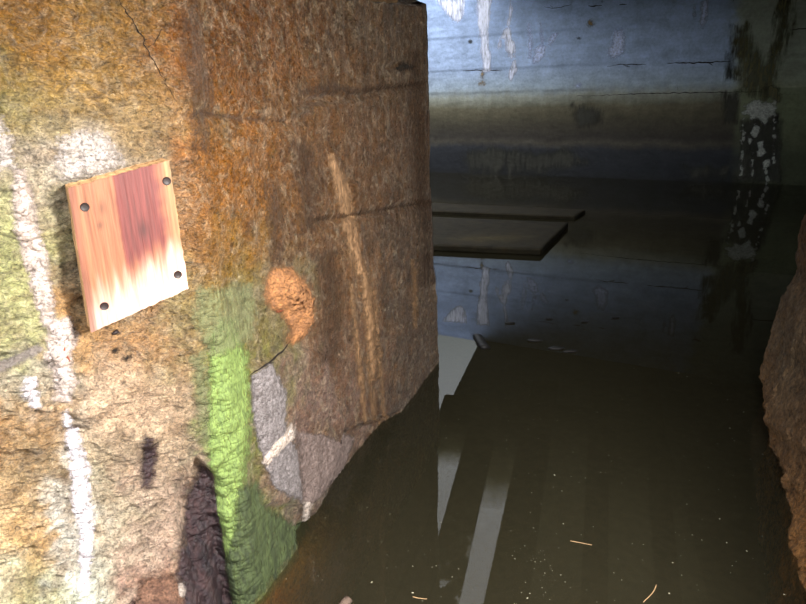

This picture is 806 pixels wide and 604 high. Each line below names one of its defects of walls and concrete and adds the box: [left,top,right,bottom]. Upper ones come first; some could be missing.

water stain [438,0,465,21]
water stain [478,0,491,72]
water stain [499,6,517,80]
water stain [55,130,125,181]
water stain [722,86,782,185]
water stain [0,120,78,403]
water stain [24,377,40,409]
water stain [141,436,158,489]
water stain [63,413,94,593]
water stain [176,466,310,604]